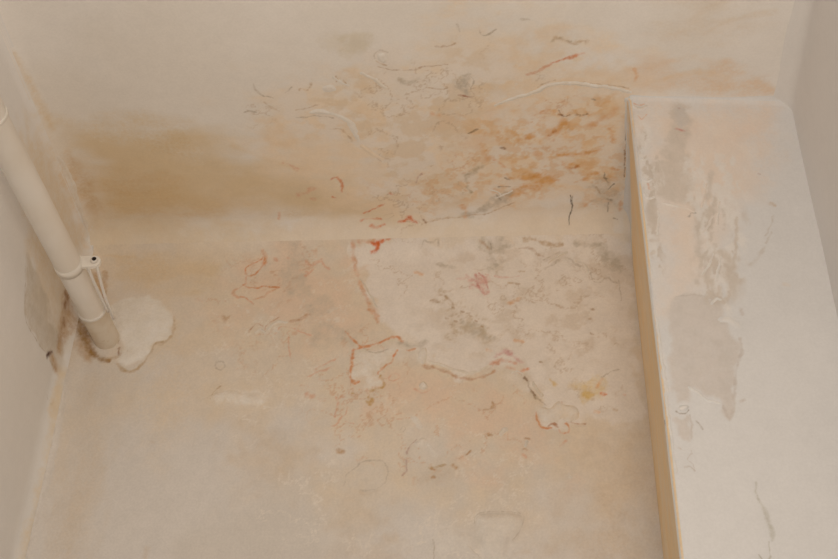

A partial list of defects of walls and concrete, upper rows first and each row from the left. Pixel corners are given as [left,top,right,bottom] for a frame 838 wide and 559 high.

damp [13,192,61,295]
damp [29,97,684,559]
damp [9,0,801,256]
peeling [420,186,520,227]
flaking render [631,101,749,423]